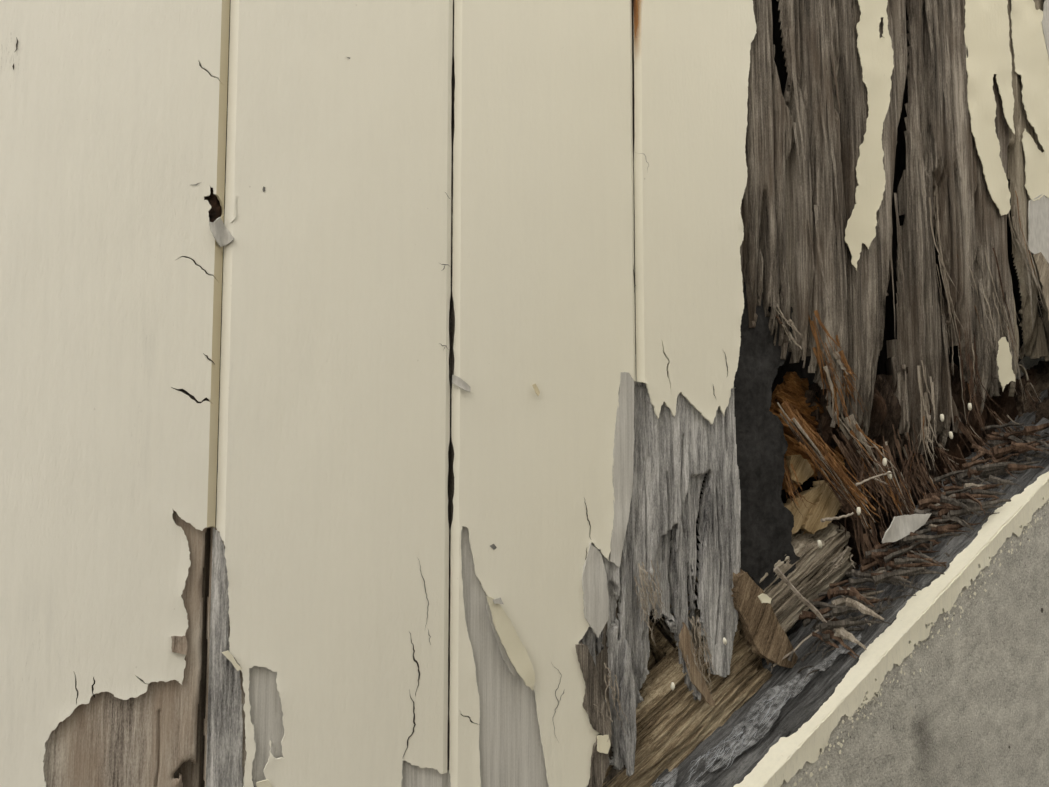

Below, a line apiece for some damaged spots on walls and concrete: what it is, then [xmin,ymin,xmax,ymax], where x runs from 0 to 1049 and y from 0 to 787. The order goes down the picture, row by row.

peeling [740,0,1049,458]
crack [171,387,210,403]
peeling [43,510,284,787]
crack [403,559,431,757]
peeling [401,761,451,787]
peeling [461,526,549,787]
peeling [575,372,741,787]